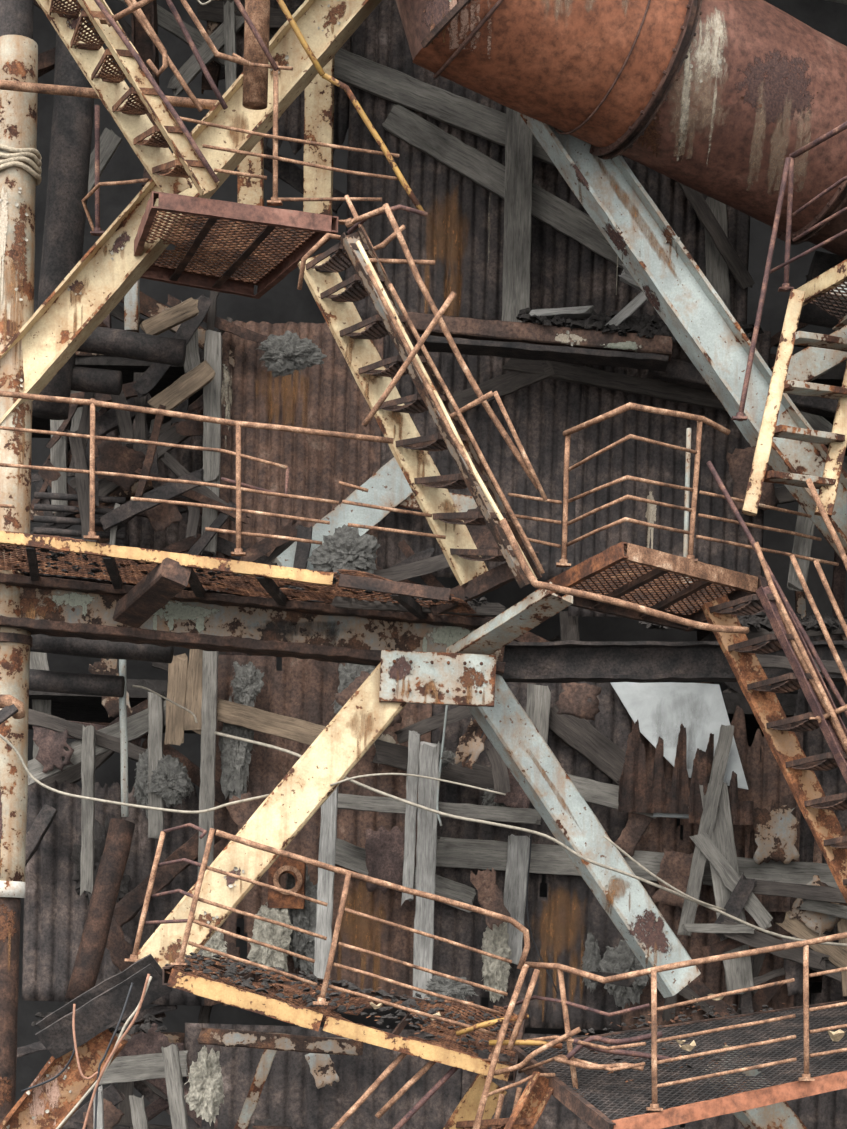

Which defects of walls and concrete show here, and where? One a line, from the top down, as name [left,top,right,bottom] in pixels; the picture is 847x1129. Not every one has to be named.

rust [422,0,450,43]
rust [734,49,818,190]
rust [593,155,680,275]
rust [457,661,488,704]